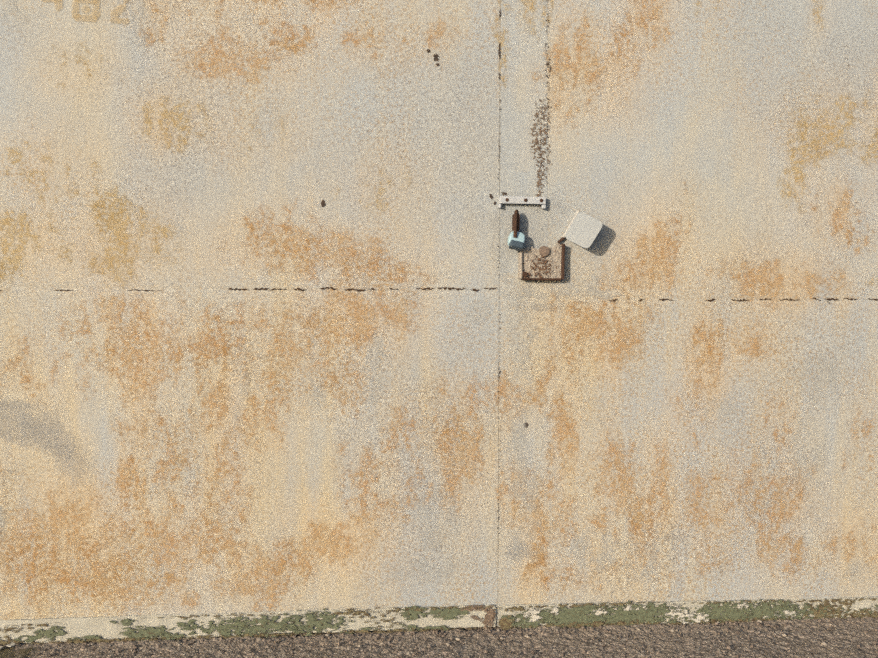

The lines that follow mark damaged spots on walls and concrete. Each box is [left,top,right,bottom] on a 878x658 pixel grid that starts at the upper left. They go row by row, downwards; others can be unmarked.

corrosion [782,98,866,197]
corrosion [522,255,552,278]
corrosion [4,497,235,609]
peeling [109,598,878,641]